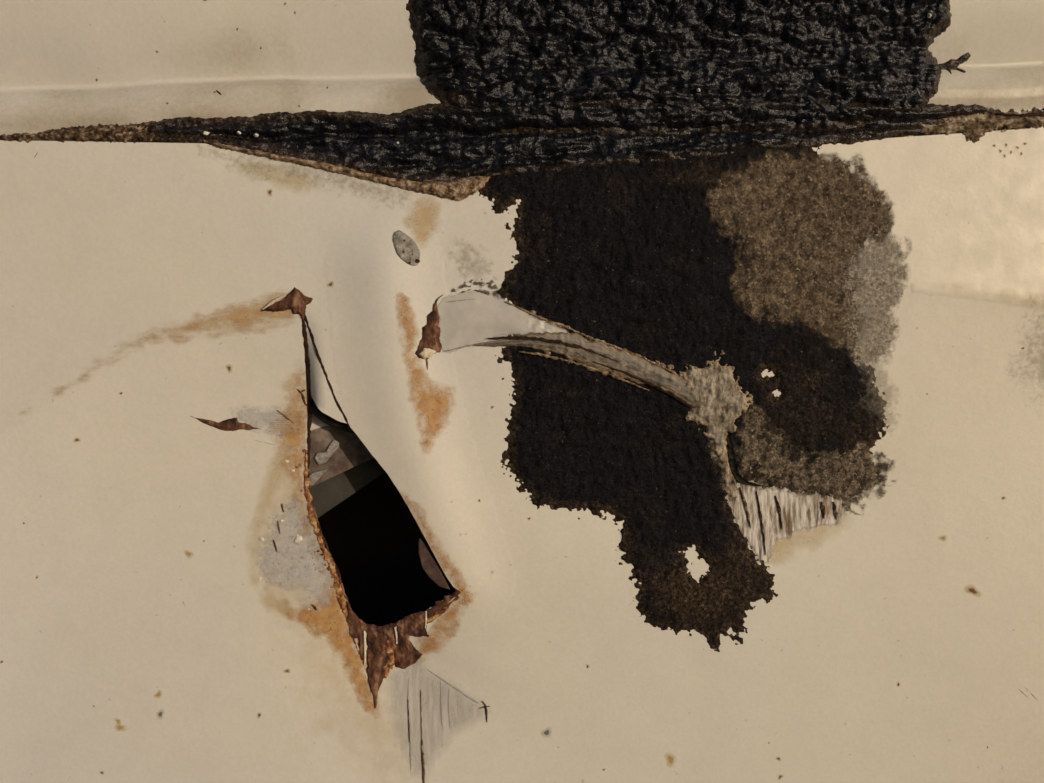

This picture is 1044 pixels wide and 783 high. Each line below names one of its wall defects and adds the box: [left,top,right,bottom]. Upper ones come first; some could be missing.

rust [191,416,259,431]
rust [177,287,313,338]
rust [400,295,448,447]
rust [276,393,464,710]